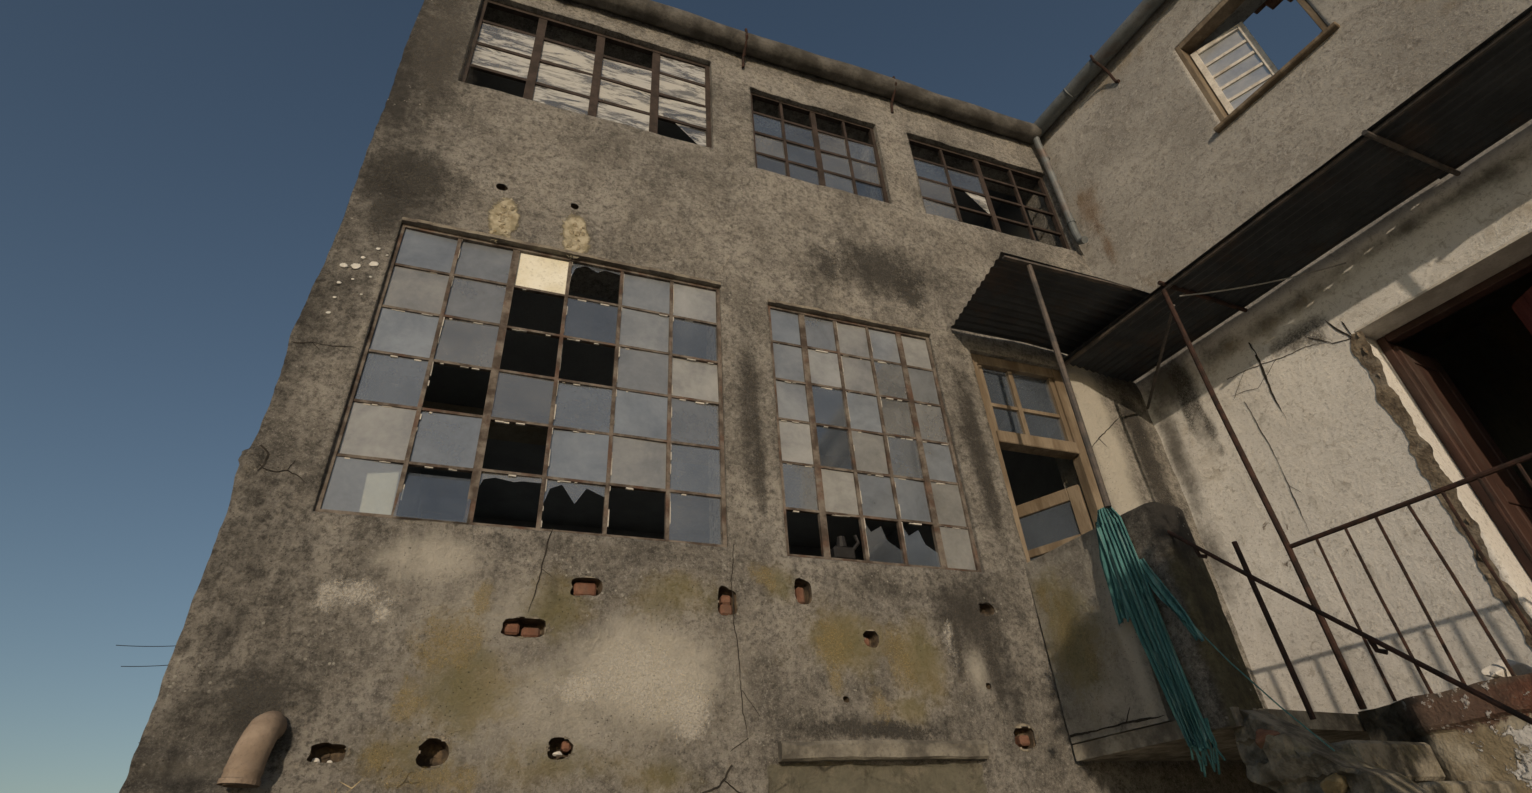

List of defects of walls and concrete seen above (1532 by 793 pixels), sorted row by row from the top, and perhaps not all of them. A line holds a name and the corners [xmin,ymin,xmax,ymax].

flaking render [487,184,520,243]
flaking render [560,204,591,259]
damp [820,242,922,314]
crack [259,459,306,483]
damp [317,581,388,619]
spalling [501,616,554,639]
crack [528,528,553,612]
spalling [570,575,603,597]